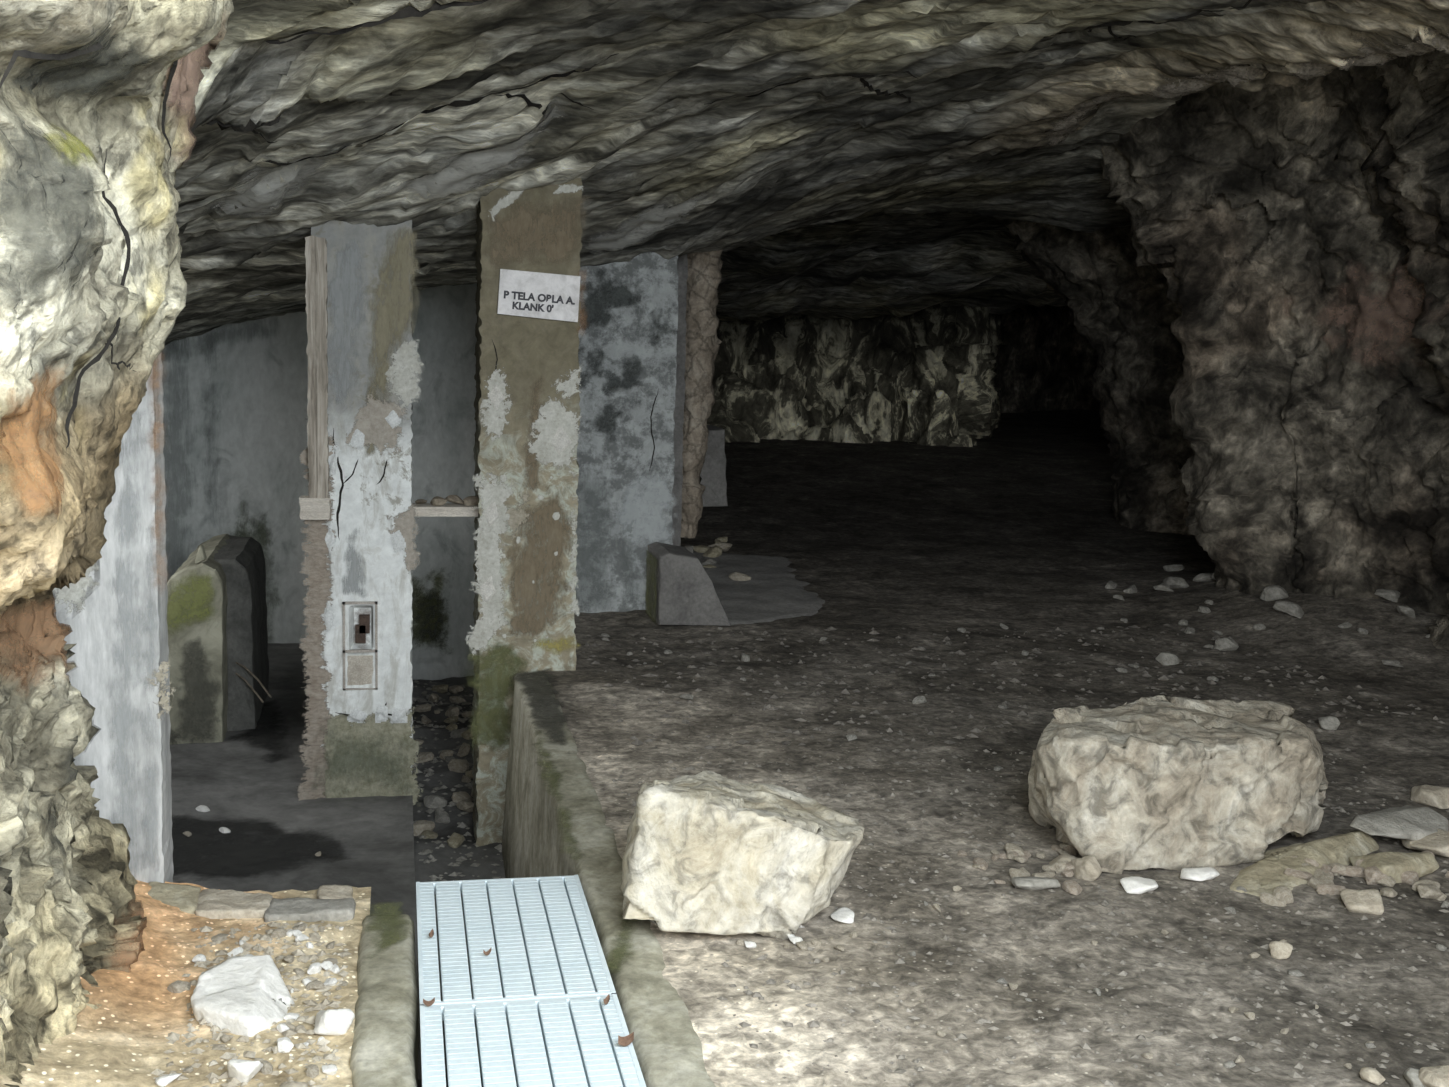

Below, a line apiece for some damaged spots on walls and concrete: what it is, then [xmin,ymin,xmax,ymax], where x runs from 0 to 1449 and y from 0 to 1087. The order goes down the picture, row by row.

spalling [488,190,524,221]
spalling [553,184,584,194]
leakage [580,270,641,330]
peeling [479,367,513,442]
peeling [528,366,582,479]
leakage [578,348,641,436]
spalling [297,340,425,805]
peeling [465,473,544,655]
peeling [552,496,580,616]